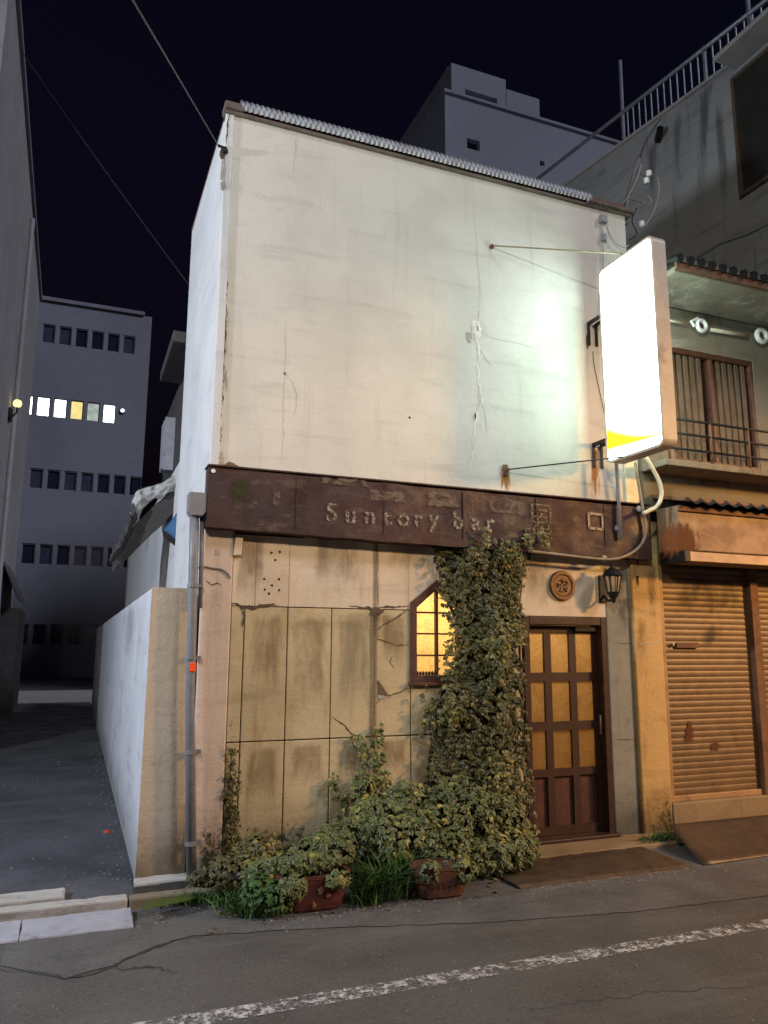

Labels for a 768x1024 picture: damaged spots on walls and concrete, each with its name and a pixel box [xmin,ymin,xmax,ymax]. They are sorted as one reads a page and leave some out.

crack [281,324,297,459]
crack [468,190,539,466]
leakage [370,543,379,739]
crack [350,605,409,704]